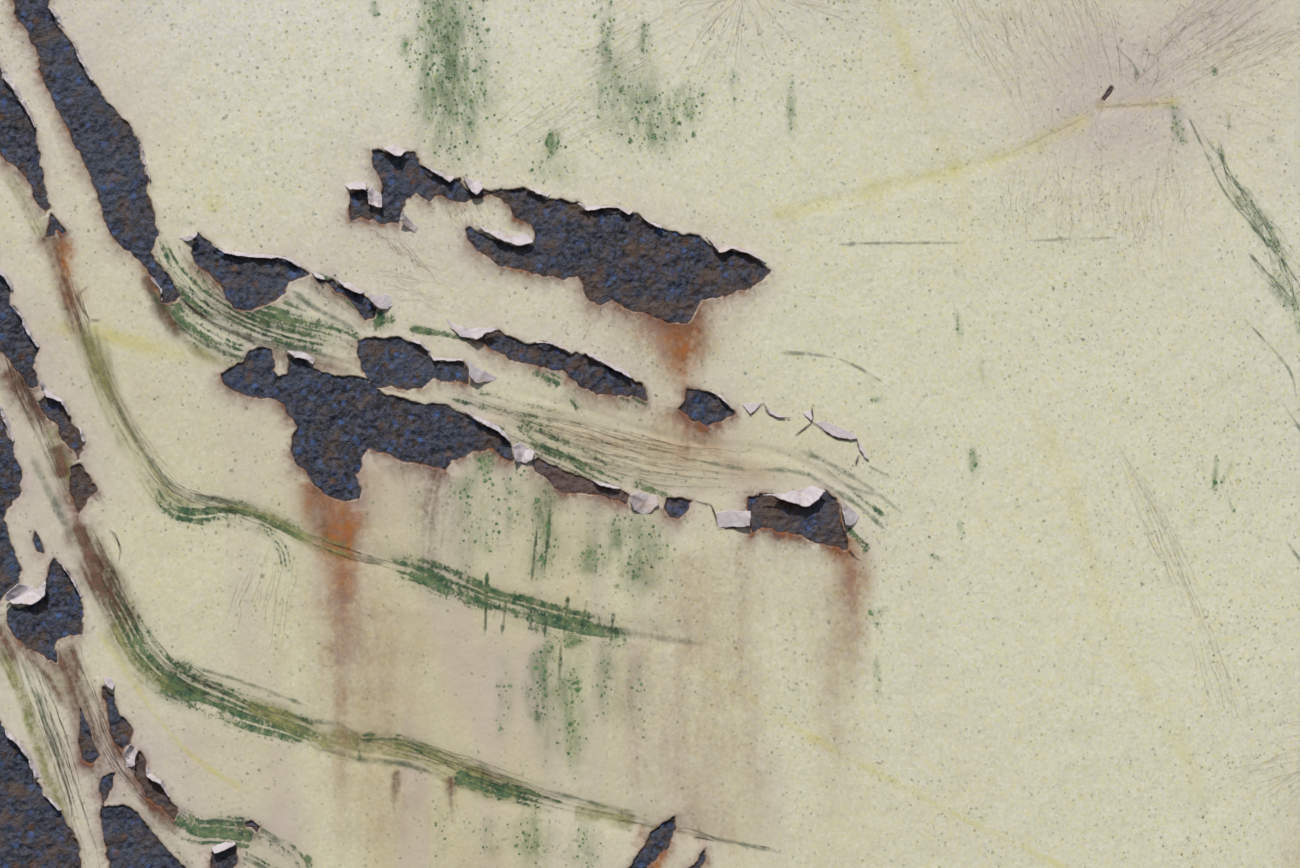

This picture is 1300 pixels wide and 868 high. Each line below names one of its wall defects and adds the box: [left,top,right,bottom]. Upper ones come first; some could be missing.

peeling [11,0,180,306]
peeling [180,232,393,320]
leakage [403,0,504,167]
peeling [220,337,690,519]
peeling [344,145,770,326]
rust [640,315,698,373]
peeling [0,406,83,663]
rust [322,498,354,600]
leakage [574,514,673,585]
leakage [393,555,626,758]
peeling [0,722,81,868]
peeling [78,676,185,868]